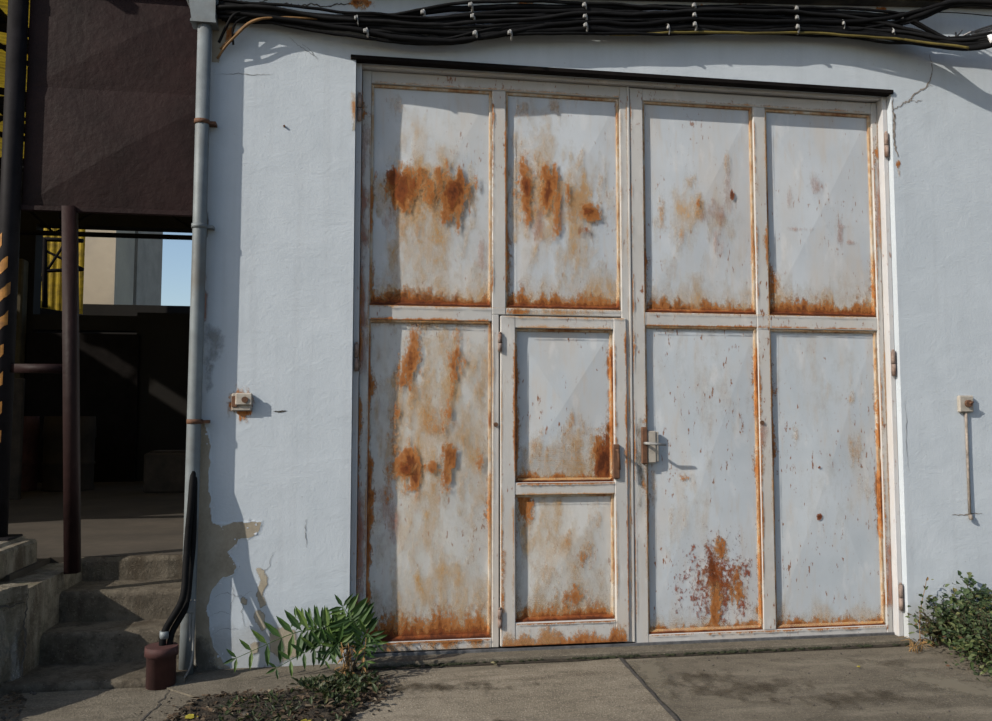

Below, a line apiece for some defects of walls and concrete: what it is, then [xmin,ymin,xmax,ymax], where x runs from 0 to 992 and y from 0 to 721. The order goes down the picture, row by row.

rust [349,0,372,8]
crack [891,55,933,157]
rust [356,103,892,652]
flaking render [195,416,264,669]
peeling [241,568,297,661]